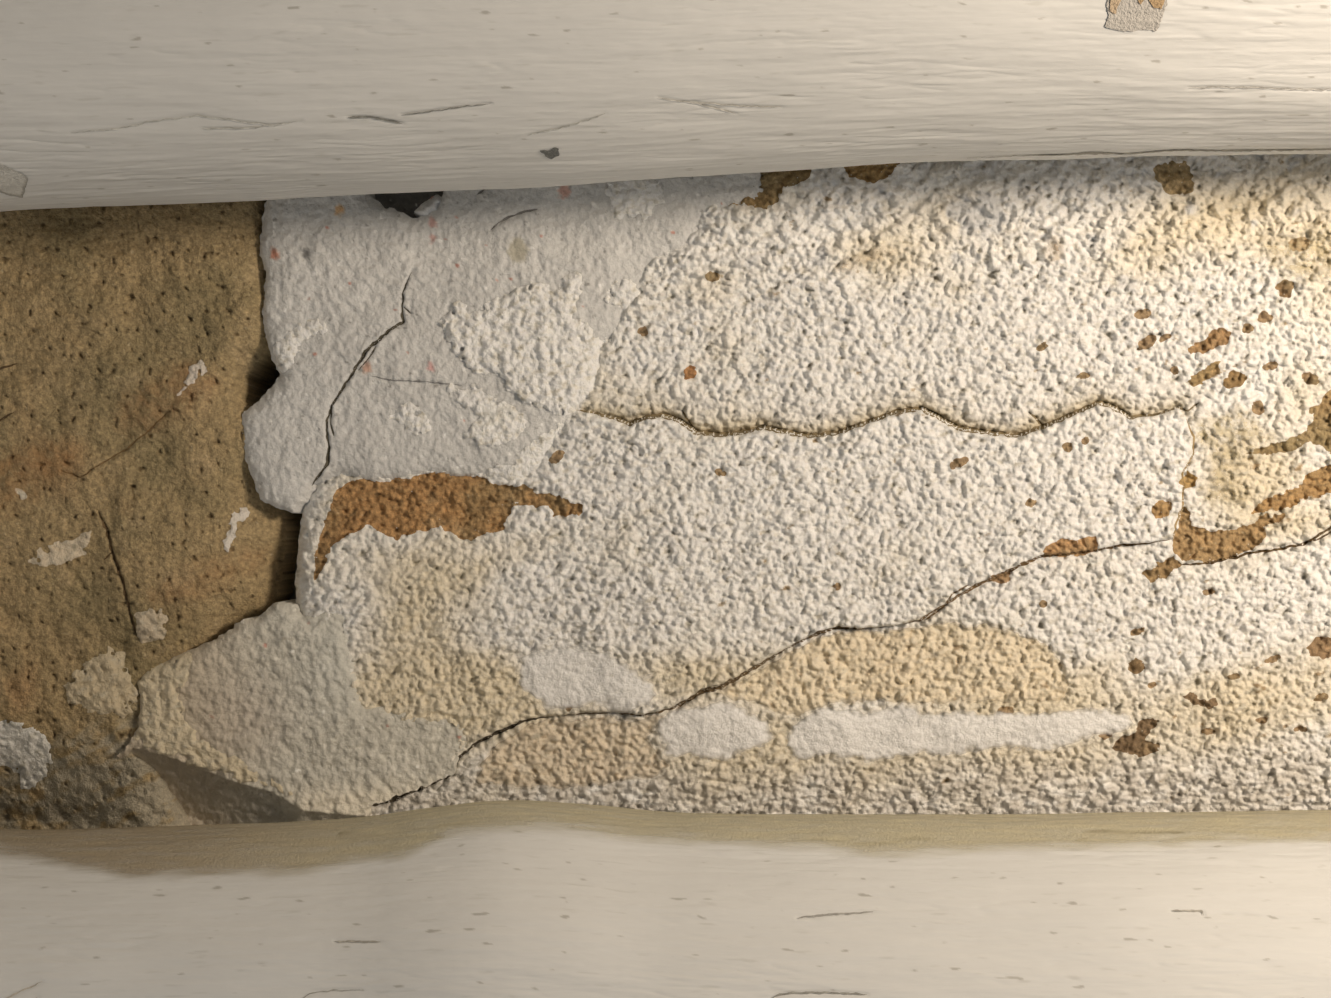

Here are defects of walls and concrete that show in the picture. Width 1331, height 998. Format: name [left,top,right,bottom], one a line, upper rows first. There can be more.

peeling [1105,0,1168,32]
peeling [725,169,811,209]
peeling [844,163,900,183]
crack [312,272,462,485]
peeling [1142,372,1331,583]
peeling [314,472,583,580]
crack [372,400,1331,806]
peeling [997,706,1014,714]
peeling [1098,718,1160,757]